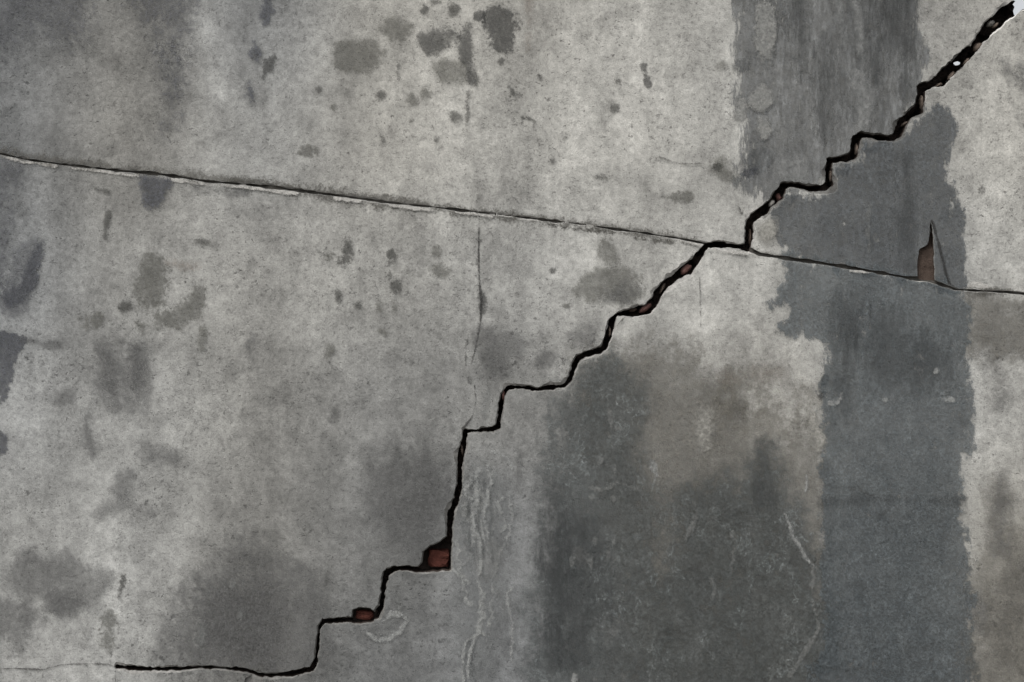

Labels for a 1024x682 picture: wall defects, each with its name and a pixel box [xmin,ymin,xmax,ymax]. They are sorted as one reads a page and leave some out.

damp [420,0,460,16]
mould [410,5,520,122]
damp [0,226,45,314]
crack [0,0,1024,544]
spalling [917,224,935,281]
damp [0,330,27,401]
damp [525,0,981,682]
crack [4,565,453,681]